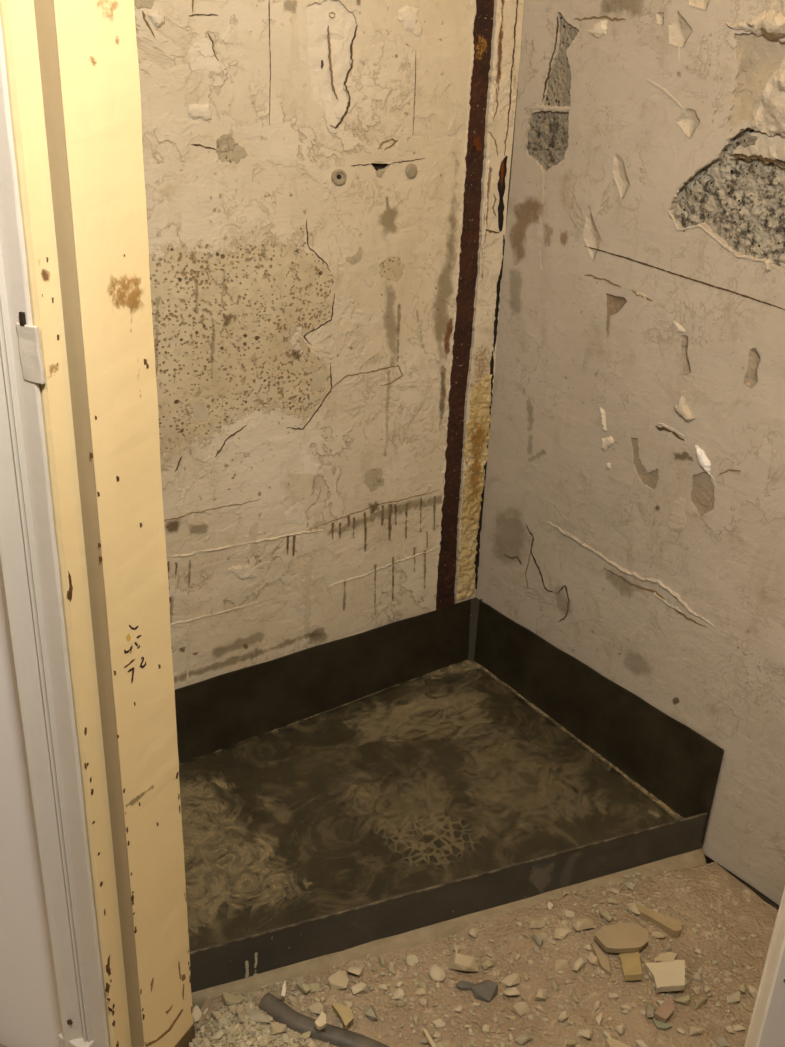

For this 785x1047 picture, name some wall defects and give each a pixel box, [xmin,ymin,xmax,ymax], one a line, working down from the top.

flaking render [134,0,155,8]
crack [142,0,233,74]
spalling [526,13,579,204]
spalling [668,22,785,272]
corrosion [110,278,141,321]
corrosion [330,0,504,610]
crack [474,0,570,622]
crack [329,365,403,391]
flaking render [668,445,741,532]
crack [604,567,706,627]
water stain [171,625,319,686]